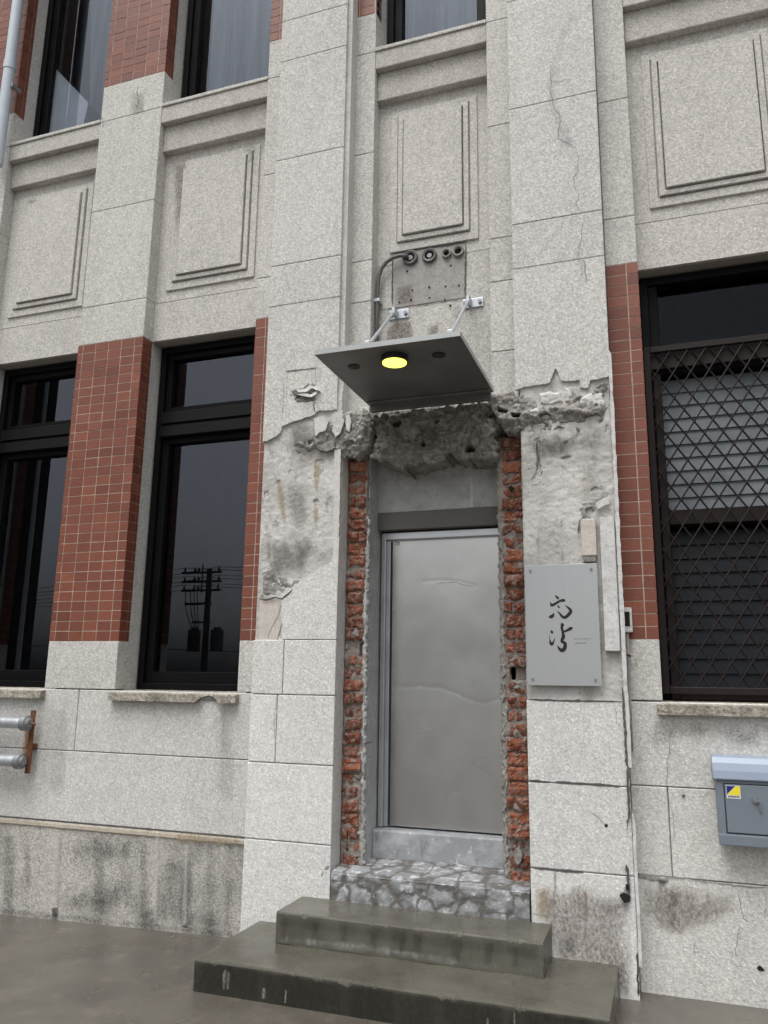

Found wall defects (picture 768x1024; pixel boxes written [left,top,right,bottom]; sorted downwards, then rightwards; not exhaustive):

crack [550,64,587,281]
spalling [256,368,377,876]
spalling [488,369,631,882]